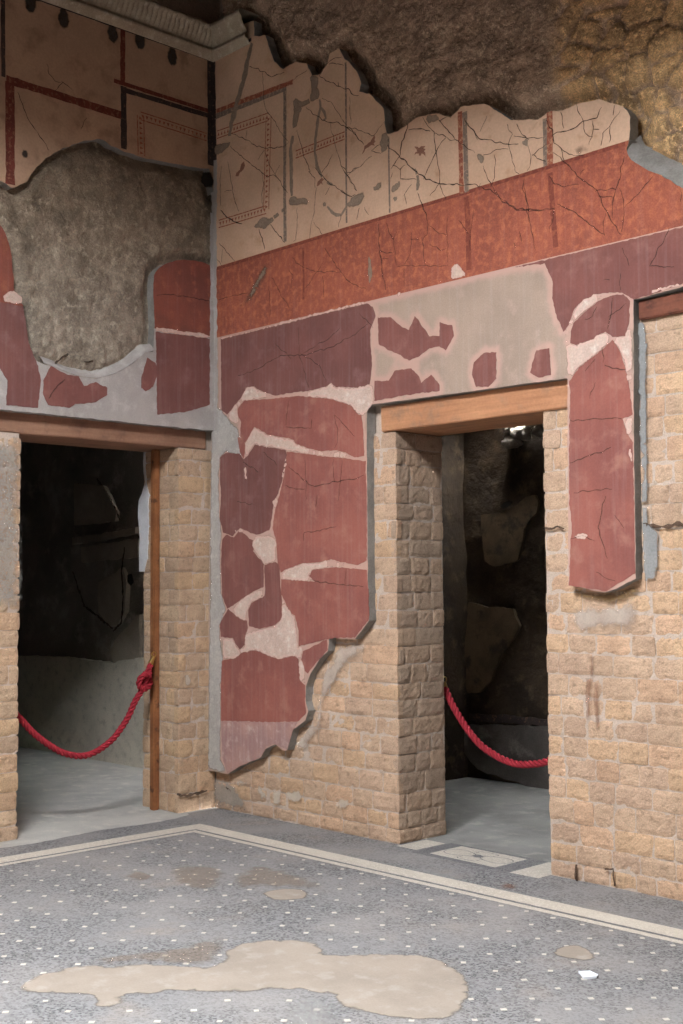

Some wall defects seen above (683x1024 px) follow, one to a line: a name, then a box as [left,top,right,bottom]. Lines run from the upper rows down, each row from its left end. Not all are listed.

flaking render [222,0,683,165]
flaking render [0,142,364,379]
crack [157,43,674,422]
crack [243,411,363,504]
peeling [233,590,263,620]
peeling [223,601,305,681]
peeling [282,560,340,581]
crack [543,488,683,581]